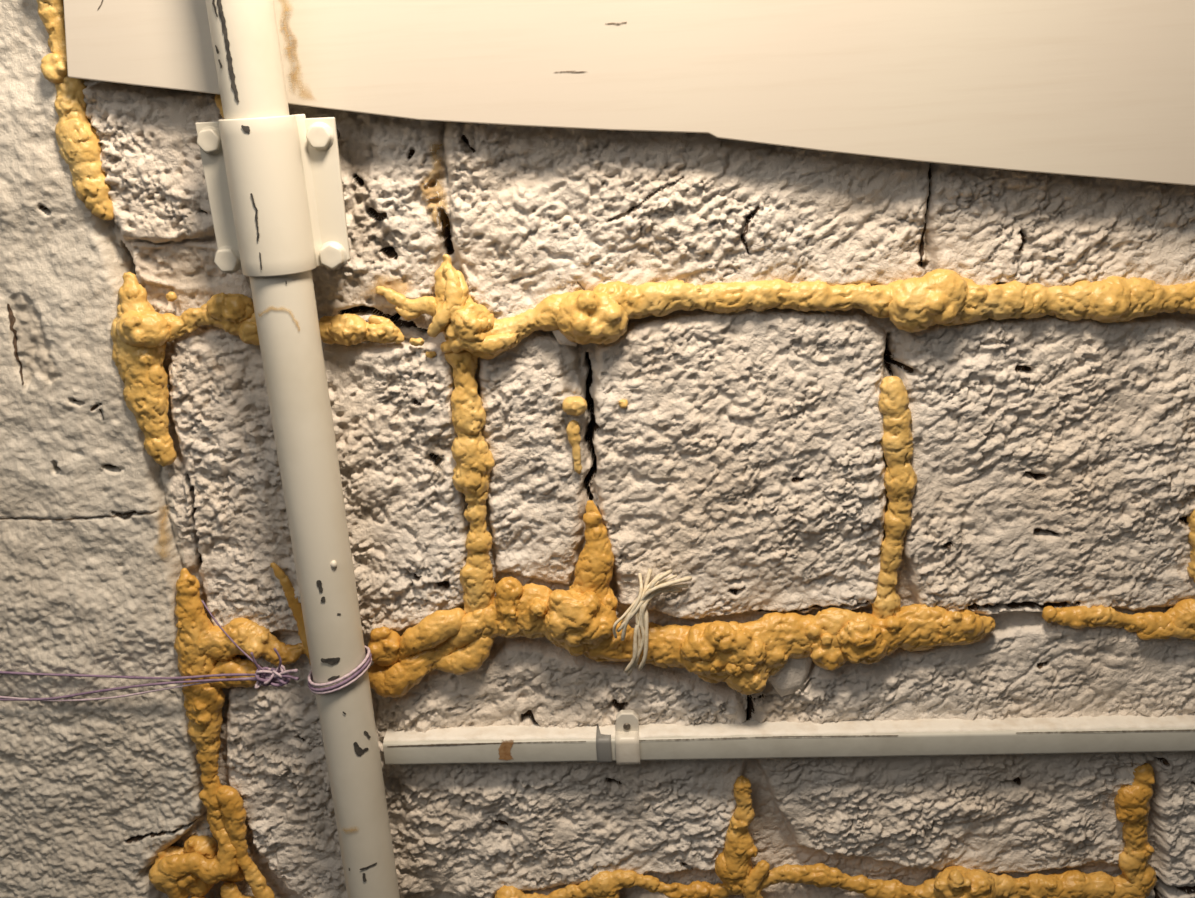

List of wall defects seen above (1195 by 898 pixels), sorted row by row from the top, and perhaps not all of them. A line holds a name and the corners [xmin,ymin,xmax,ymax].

crack [7,304,24,385]
crack [584,352,600,500]
crack [187,474,203,570]
crack [1153,876,1195,898]